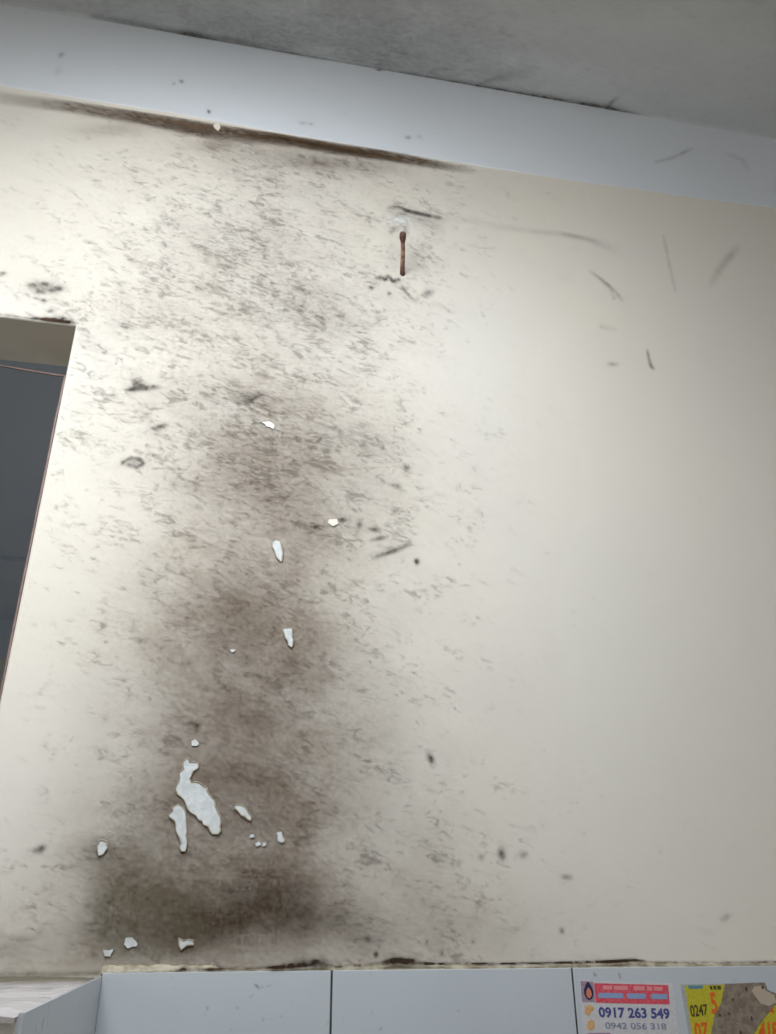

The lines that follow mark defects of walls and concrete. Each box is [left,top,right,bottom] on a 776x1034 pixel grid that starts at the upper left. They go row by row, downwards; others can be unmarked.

damp [65,103,440,166]
peeling [272,539,284,562]
peeling [282,627,294,648]
peeling [168,739,222,852]
peeling [234,804,253,821]
peeling [96,838,108,856]
damp [132,763,322,948]
peeling [103,938,137,956]
peeling [178,937,194,951]